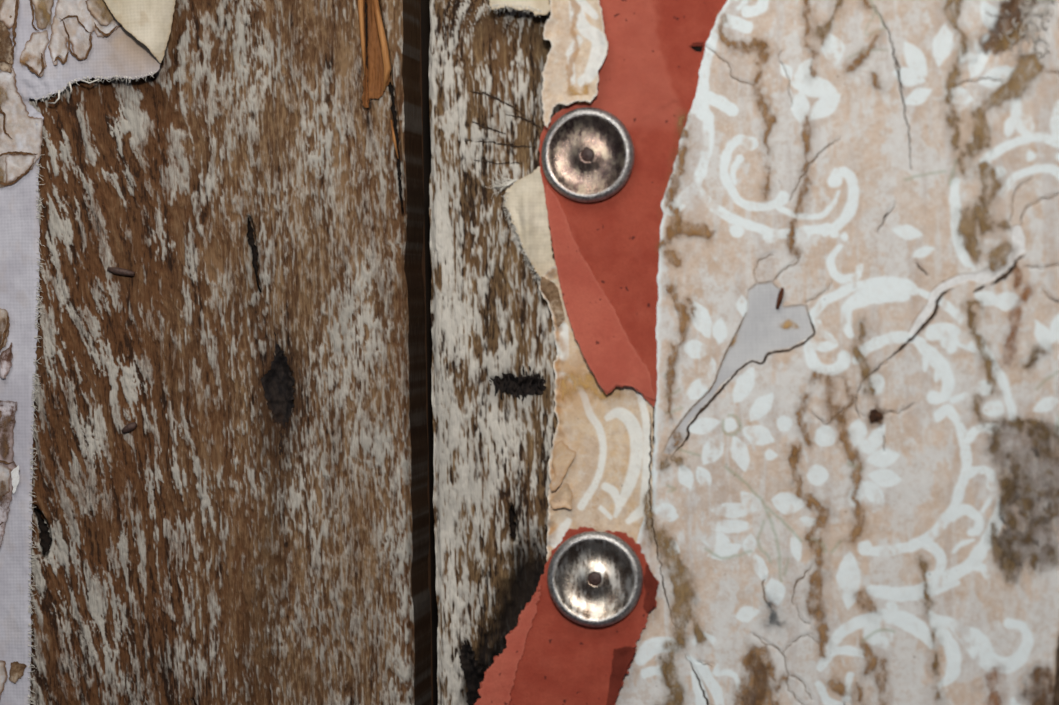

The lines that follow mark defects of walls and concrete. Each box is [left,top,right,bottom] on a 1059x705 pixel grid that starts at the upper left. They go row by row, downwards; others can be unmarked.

peeling [0,0,122,188]
crack [874,6,912,170]
crack [790,139,840,199]
peeling [0,308,13,379]
peeling [0,400,20,547]
crack [646,415,679,629]
peeling [663,282,815,457]
crack [811,362,914,451]
damp [967,300,1059,581]
peeling [0,660,27,699]
crack [685,656,711,705]
crack [753,566,819,705]